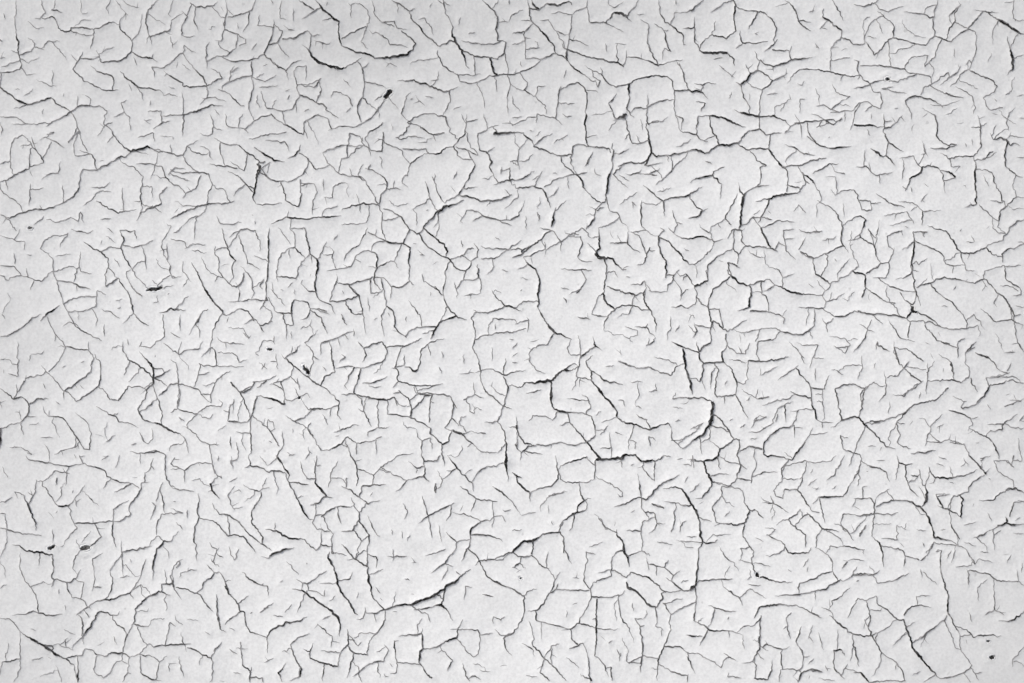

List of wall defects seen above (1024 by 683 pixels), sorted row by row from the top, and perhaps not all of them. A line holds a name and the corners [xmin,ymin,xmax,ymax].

crack [776,1,811,31]
crack [120,71,176,99]
crack [139,95,221,142]
crack [690,167,724,197]
crack [458,200,525,225]
crack [84,228,153,326]
crack [562,268,590,303]
crack [139,297,208,368]
crack [0,406,306,682]
crack [973,500,1024,553]
crack [282,624,338,681]
crack [522,622,566,680]